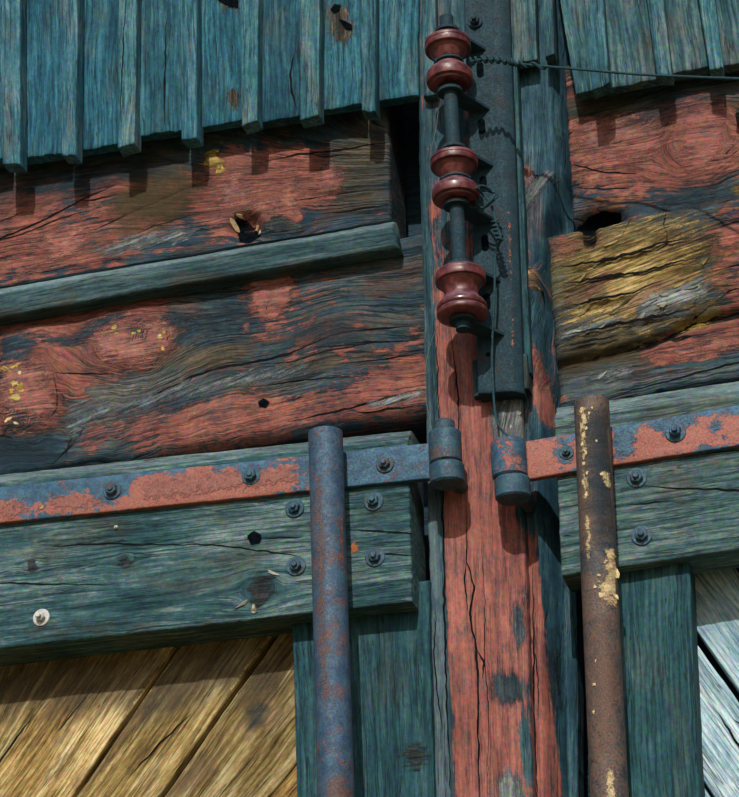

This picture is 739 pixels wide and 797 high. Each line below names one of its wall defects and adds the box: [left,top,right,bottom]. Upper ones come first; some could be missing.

peeling [0,312,123,365]
peeling [126,275,295,344]
crack [557,214,739,371]
crack [49,537,299,556]
rust [338,517,358,569]
peeling [593,548,620,607]
crack [433,491,489,797]
crack [719,715,739,747]